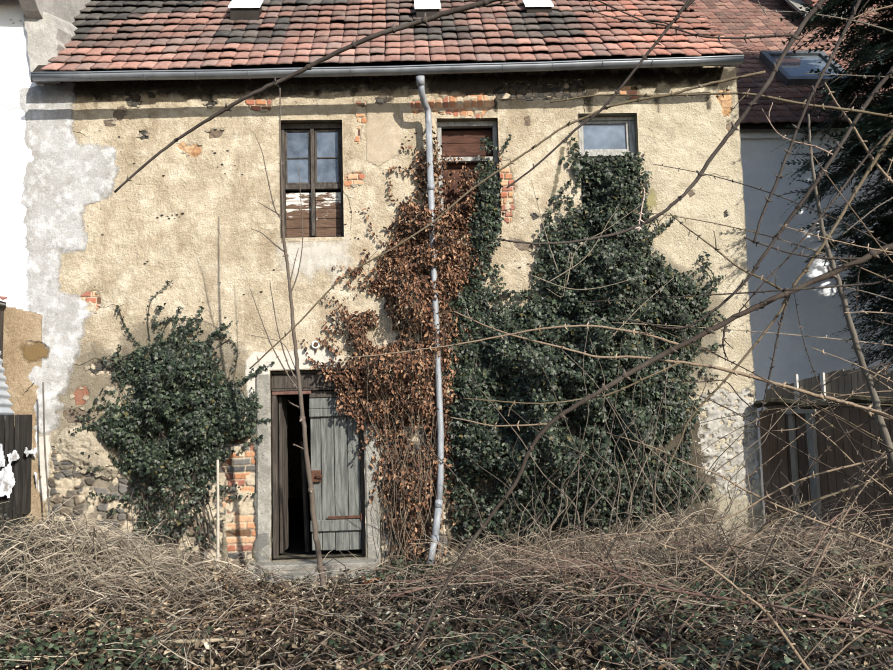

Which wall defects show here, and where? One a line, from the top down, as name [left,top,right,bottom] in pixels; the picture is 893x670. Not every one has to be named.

flaking render [245,99,272,112]
flaking render [411,80,585,119]
flaking render [178,127,224,158]
flaking render [344,172,365,188]
flaking render [499,157,515,224]
flaking render [509,237,539,251]
flaking render [80,291,105,313]
peeling [3,307,256,564]
flaking render [697,388,760,499]